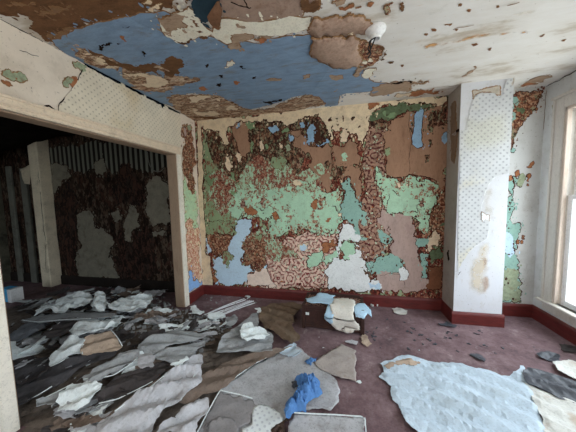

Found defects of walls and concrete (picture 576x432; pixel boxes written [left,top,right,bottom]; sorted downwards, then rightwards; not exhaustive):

crack [45,63,180,114]
peeling [0,0,459,294]
peeling [502,161,535,304]